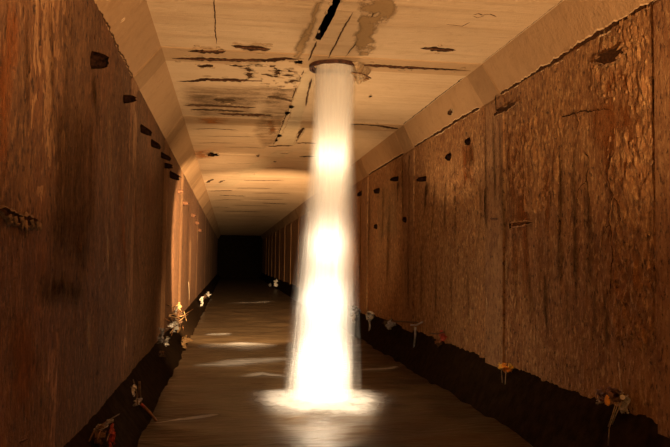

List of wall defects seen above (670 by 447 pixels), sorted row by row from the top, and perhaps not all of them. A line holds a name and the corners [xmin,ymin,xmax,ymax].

crack [211,0,219,44]
crack [291,12,375,106]
damp [355,0,396,56]
crack [369,0,655,175]
peeling [493,98,564,230]
peeling [587,5,655,251]